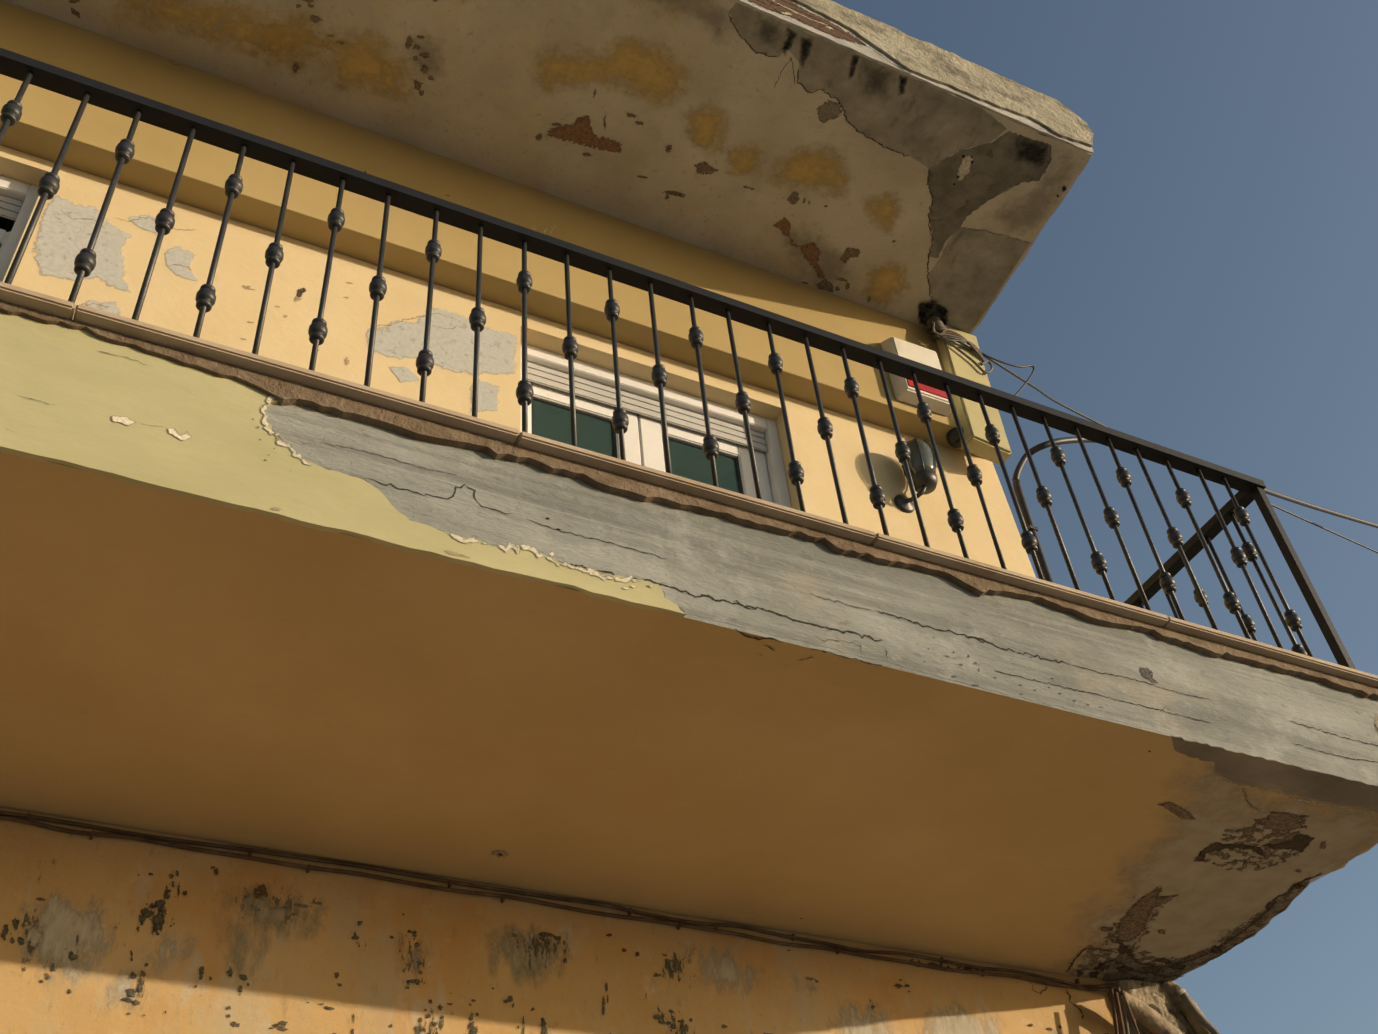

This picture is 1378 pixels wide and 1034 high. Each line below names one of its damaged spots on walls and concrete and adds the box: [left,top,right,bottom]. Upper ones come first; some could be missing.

leakage [131,0,404,96]
leakage [539,39,683,102]
peeling [535,115,622,157]
peeling [694,162,718,175]
flaking render [729,0,1052,303]
peeling [33,196,198,314]
peeling [366,308,517,411]
crack [324,442,1210,723]
spalling [252,395,1378,983]
crack [1291,721,1378,762]